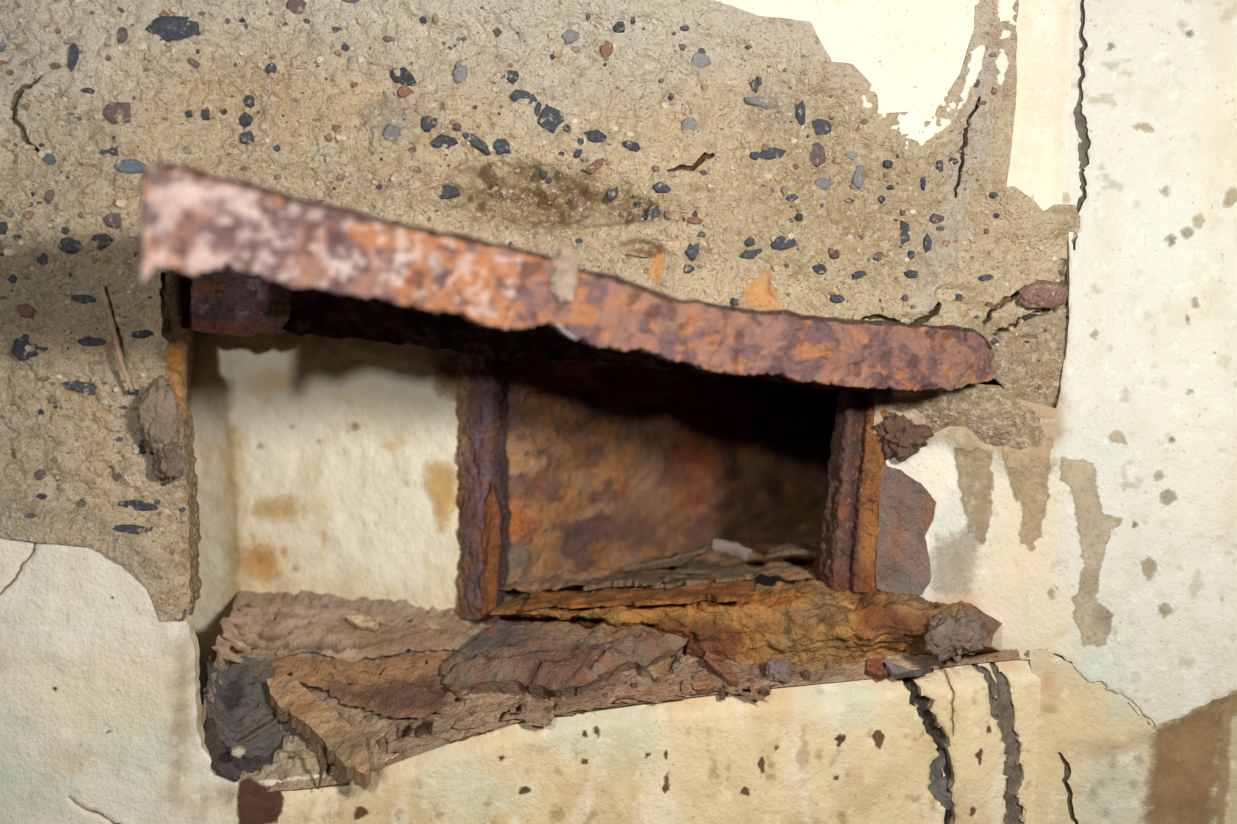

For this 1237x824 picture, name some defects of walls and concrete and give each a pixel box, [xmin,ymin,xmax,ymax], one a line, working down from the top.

crack [14,86,40,152]
crack [1072,0,1090,250]
spalling [0,0,1080,621]
crack [0,542,37,596]
peeling [935,437,1136,646]
peeling [866,658,935,681]
peeling [204,718,242,782]
spalling [354,807,368,819]
spalling [872,730,884,748]
crack [903,662,1023,824]
crack [1059,752,1078,824]
leakage [1147,692,1237,824]